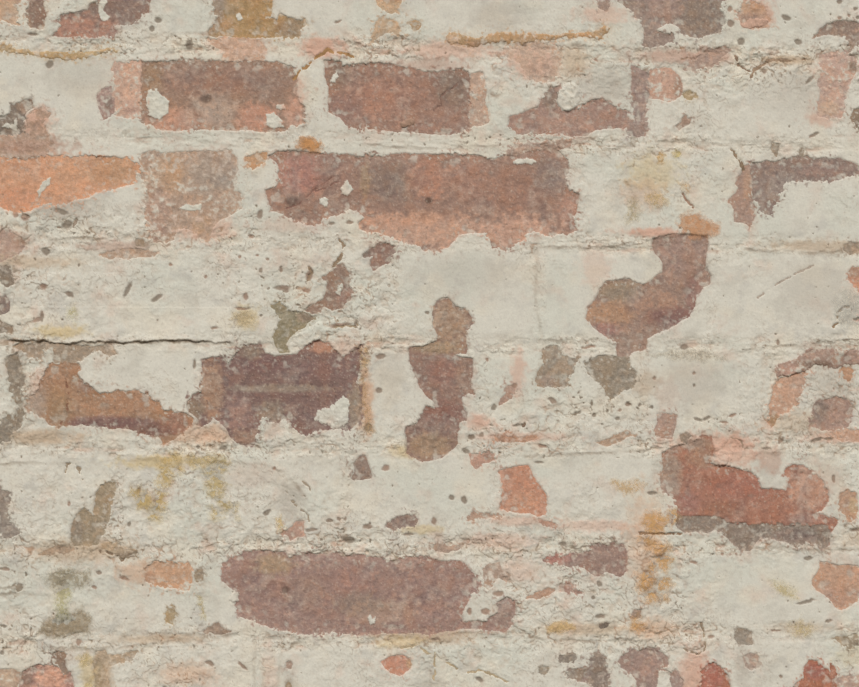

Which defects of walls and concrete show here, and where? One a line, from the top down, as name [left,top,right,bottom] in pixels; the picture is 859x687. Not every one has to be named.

peeling [96,58,306,132]
peeling [324,60,490,137]
peeling [499,38,697,138]
peeling [0,149,579,271]
peeling [728,143,859,229]
peeling [0,263,363,447]
peeling [405,298,475,462]
peeling [535,234,711,401]
spalling [767,347,859,431]
spalling [654,412,858,552]
peeling [221,539,516,636]
peeling [558,651,611,687]